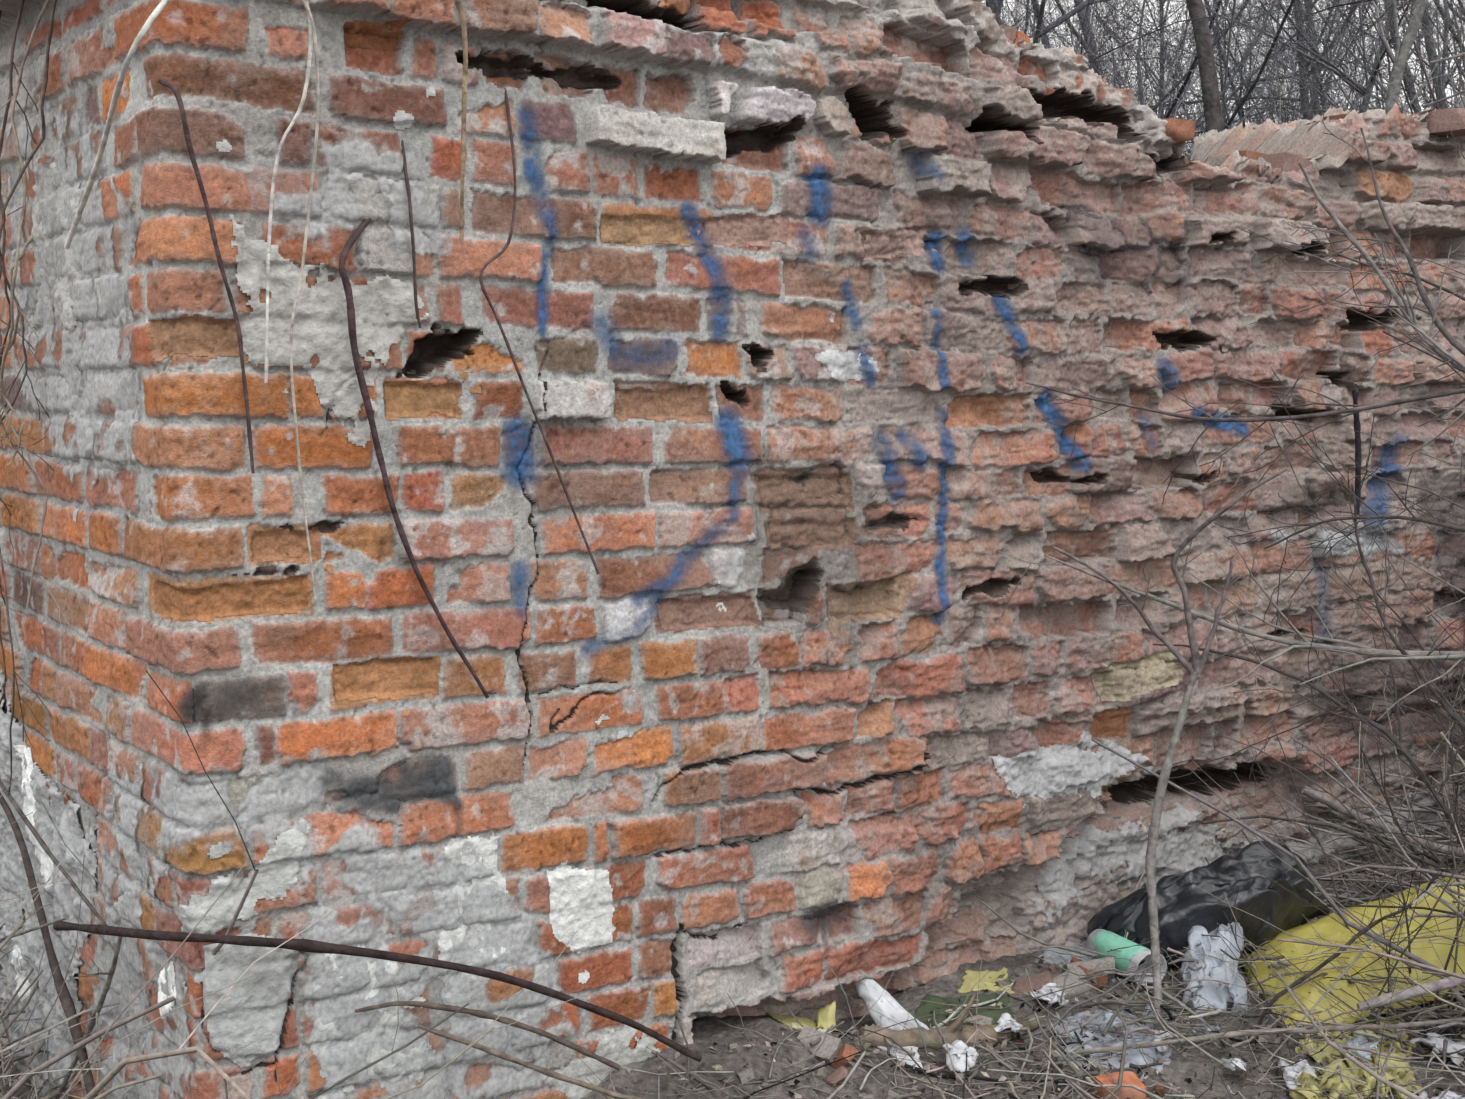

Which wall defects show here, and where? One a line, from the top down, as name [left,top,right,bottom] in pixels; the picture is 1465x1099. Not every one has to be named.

spalling [586,0,708,38]
spalling [455,50,621,90]
spalling [724,114,806,157]
spalling [844,86,907,142]
spalling [965,86,1322,177]
spalling [383,322,484,420]
crack [515,373,617,765]
spalling [654,471,919,637]
crack [651,744,930,802]
spalling [1103,762,1278,810]
crack [653,830,792,857]
crack [670,922,748,1039]